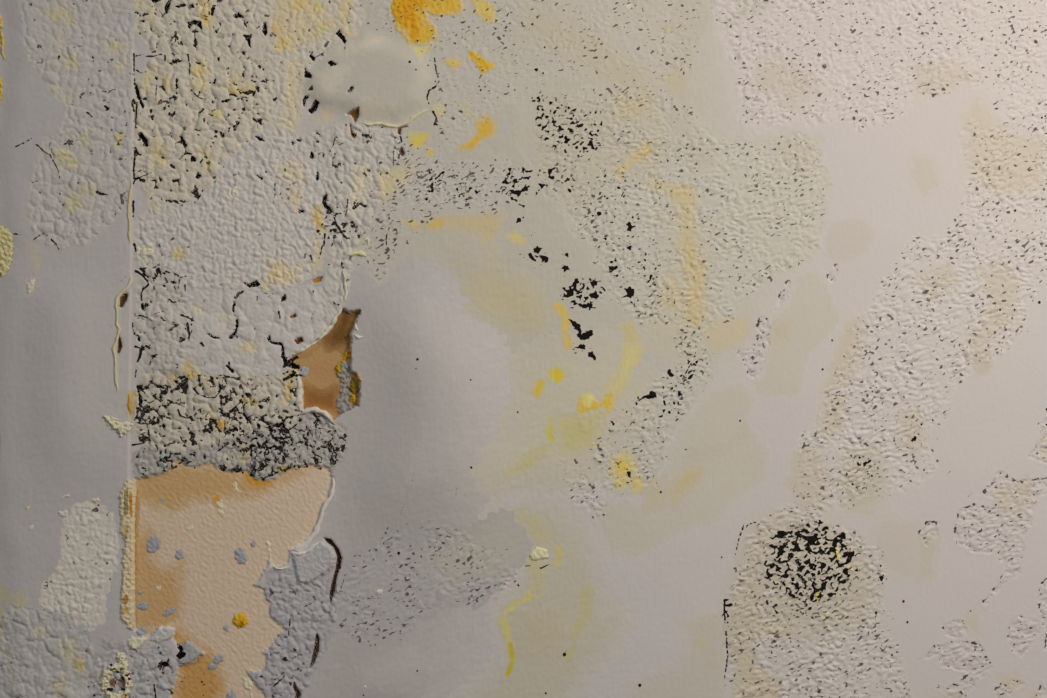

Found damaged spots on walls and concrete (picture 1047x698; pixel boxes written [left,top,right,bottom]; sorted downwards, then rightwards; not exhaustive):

water stain [0,0,320,698]
peeling [296,376,335,424]
peeling [293,307,343,355]
water stain [186,0,944,698]
peeling [99,479,203,698]
peeling [272,478,337,585]
spalling [918,521,940,543]
spalling [953,472,1047,604]
spalling [1007,578,1047,657]